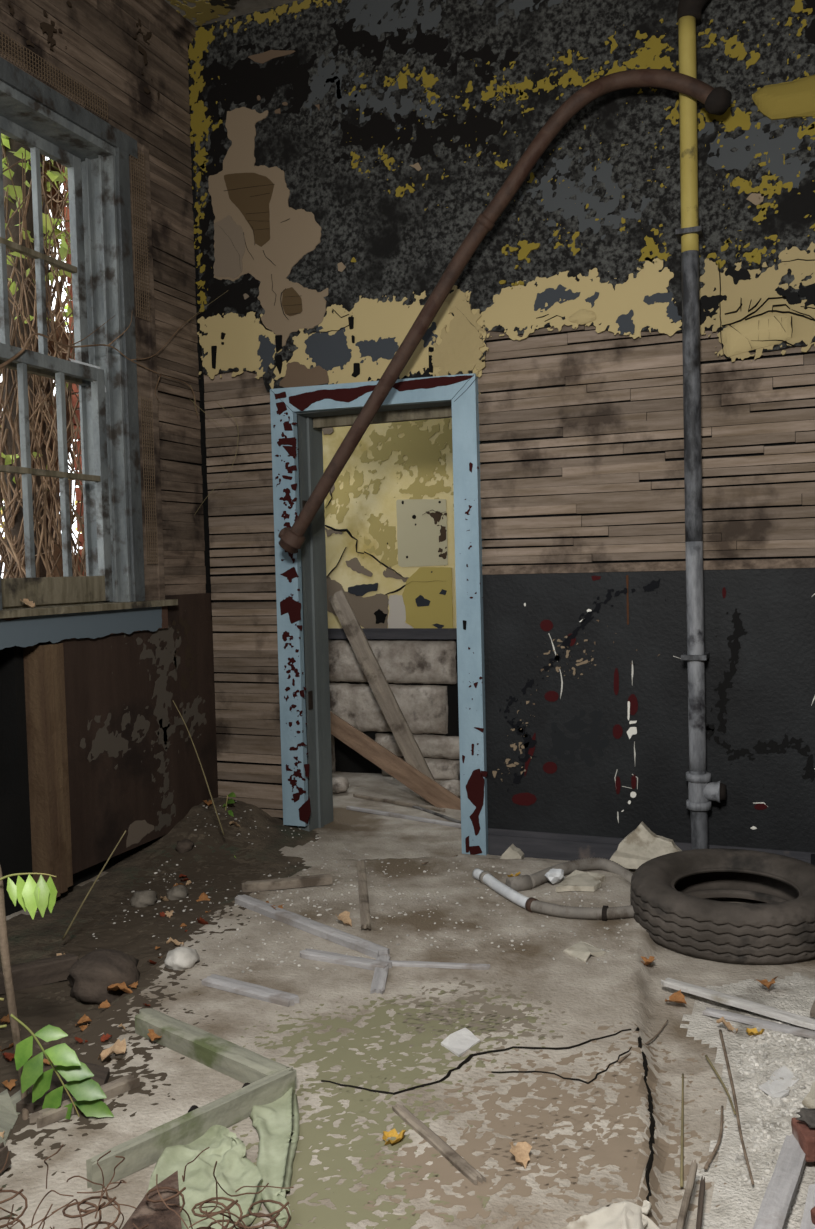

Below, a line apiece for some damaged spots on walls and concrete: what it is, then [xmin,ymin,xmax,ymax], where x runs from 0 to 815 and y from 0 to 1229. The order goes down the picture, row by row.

peeling [784,0,812,37]
peeling [698,19,760,73]
peeling [697,102,761,147]
peeling [797,116,815,141]
spalling [167,0,682,505]
peeling [699,153,815,362]
peeling [280,553,298,579]
peeling [326,557,453,628]
peeling [280,597,302,637]
peeling [462,578,666,855]
peeling [293,792,311,824]